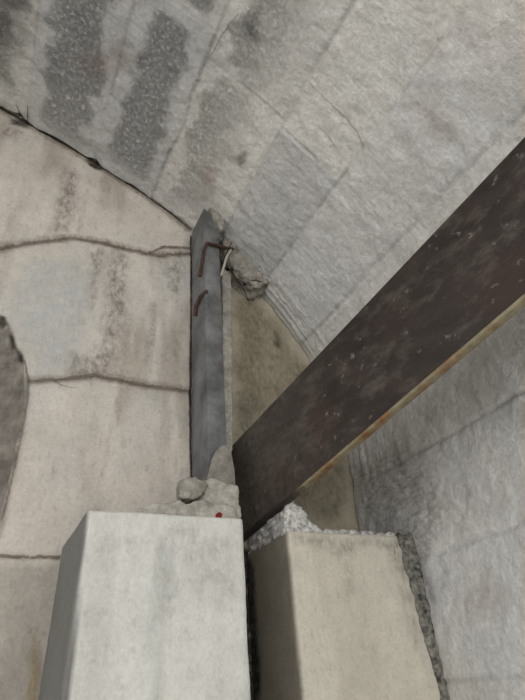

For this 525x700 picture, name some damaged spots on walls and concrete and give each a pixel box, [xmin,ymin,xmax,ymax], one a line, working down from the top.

crack [0,106,192,478]